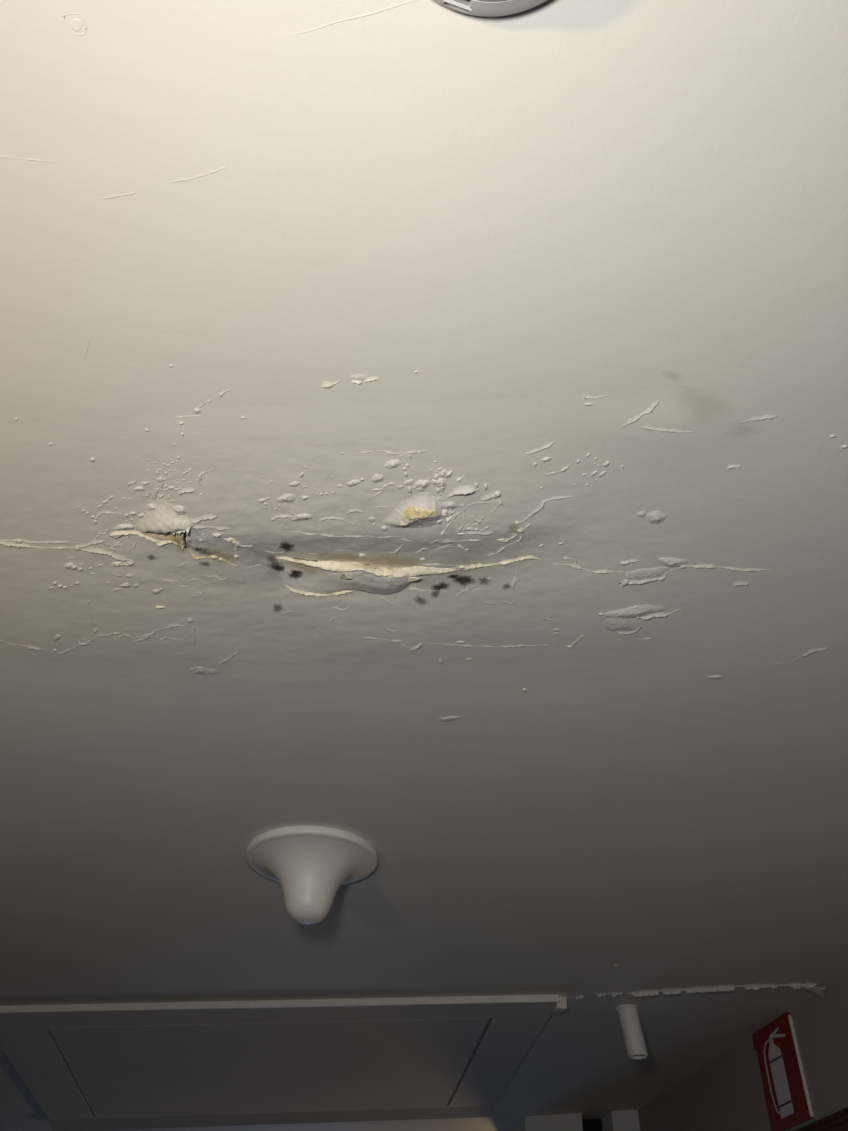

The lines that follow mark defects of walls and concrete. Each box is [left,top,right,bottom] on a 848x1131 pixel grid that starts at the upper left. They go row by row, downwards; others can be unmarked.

crack [0,529,150,588]
damp [270,543,302,578]
peeling [109,467,519,622]
damp [419,575,486,602]
crack [456,496,771,586]